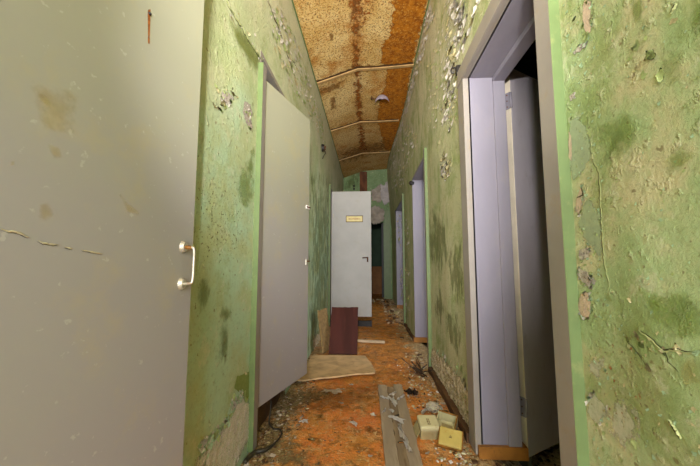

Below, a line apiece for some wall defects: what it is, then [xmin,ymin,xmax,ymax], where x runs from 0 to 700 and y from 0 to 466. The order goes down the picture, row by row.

peeling [213,83,253,130]
corrosion [341,0,427,162]
peeling [441,0,480,133]
flaking render [371,181,389,224]
flaking render [576,246,597,321]
crack [625,326,700,370]
flaking render [196,371,249,466]